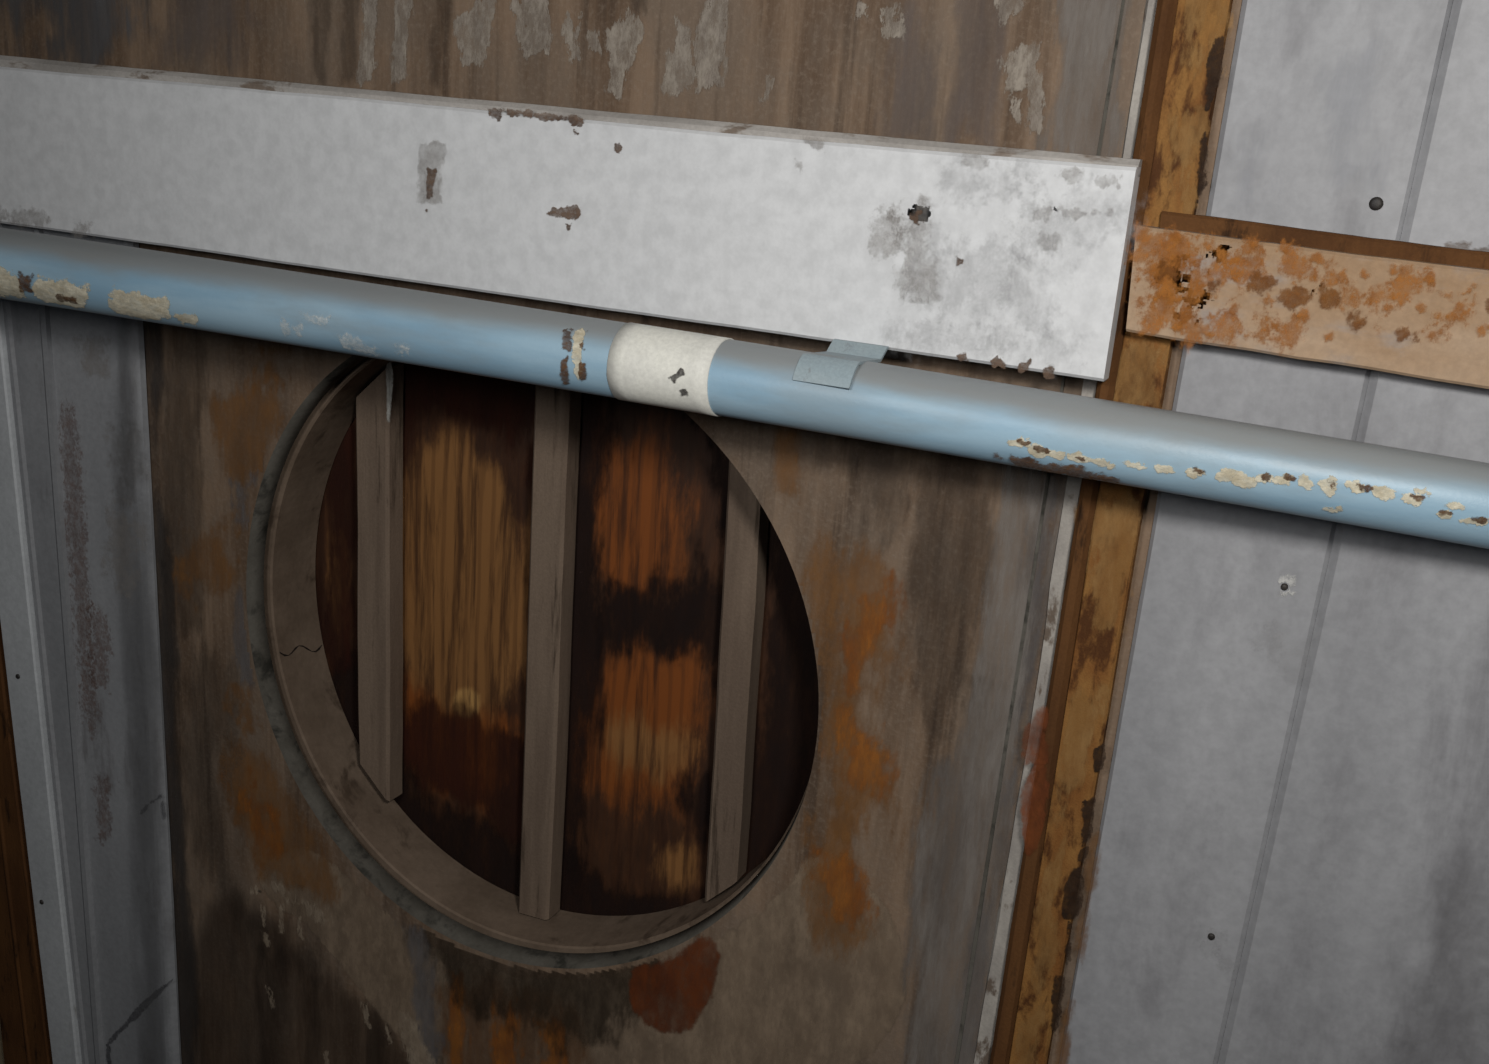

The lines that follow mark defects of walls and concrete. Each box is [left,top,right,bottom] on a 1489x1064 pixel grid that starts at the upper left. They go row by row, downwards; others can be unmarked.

peeling [488,108,584,135]
peeling [546,204,581,231]
peeling [0,266,90,308]
peeling [108,290,198,325]
corrosion [1124,225,1489,348]
peeling [1007,436,1489,526]
leakage [255,848,907,1064]
corrosion [629,938,720,1033]